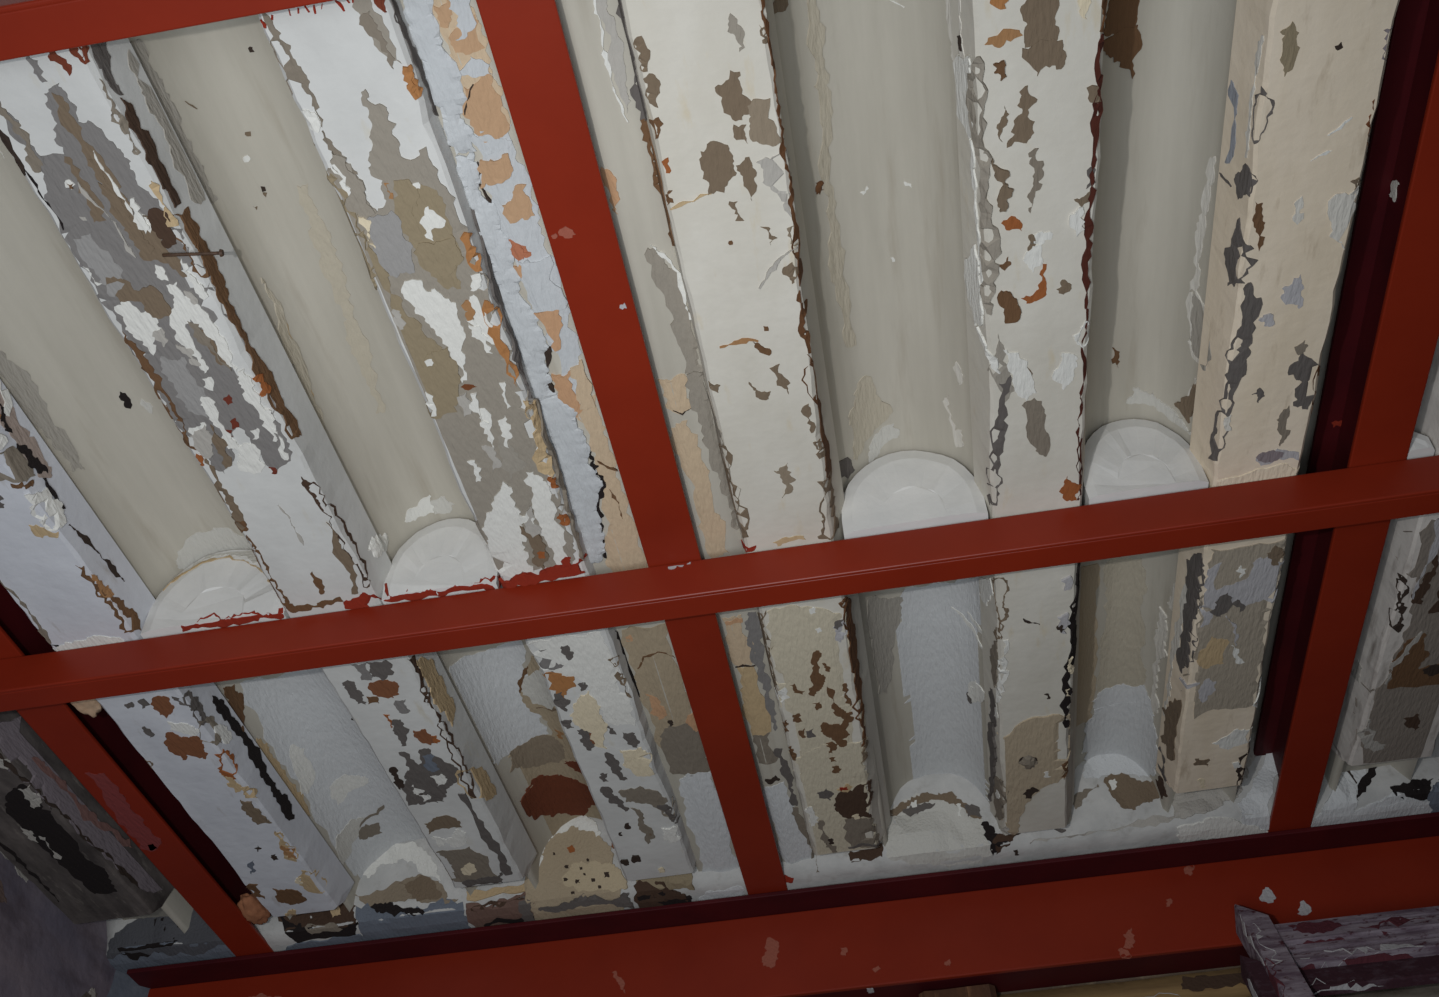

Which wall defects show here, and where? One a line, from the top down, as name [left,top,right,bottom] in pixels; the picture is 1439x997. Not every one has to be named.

peeling [0,42,302,604]
peeling [262,0,576,594]
peeling [551,359,648,572]
peeling [699,70,799,284]
peeling [1103,0,1143,79]
spalling [1174,163,1304,461]
spalling [1256,340,1320,466]
spalling [124,623,745,951]
peeling [722,597,883,873]
spalling [956,577,1069,855]
spalling [1073,698,1182,810]
peeling [1176,545,1285,674]